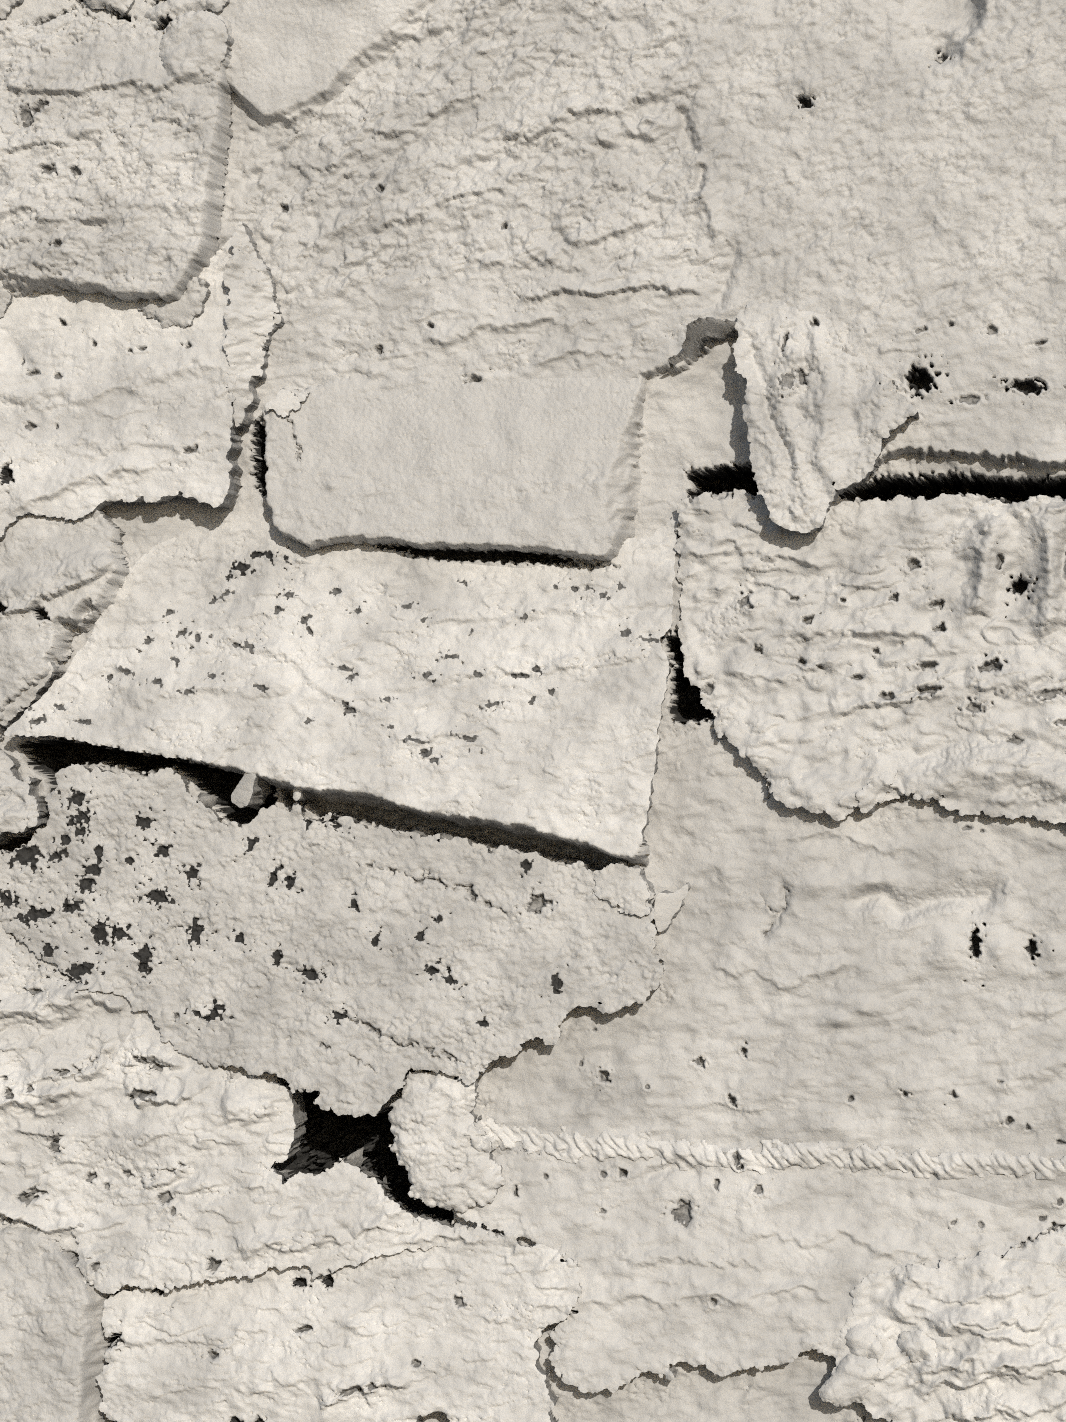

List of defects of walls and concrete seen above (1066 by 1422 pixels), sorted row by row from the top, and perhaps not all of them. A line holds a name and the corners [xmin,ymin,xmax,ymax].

crack [250,416,303,496]
crack [373,544,587,566]
crack [666,631,714,725]
crack [0,834,34,852]
crack [19,737,618,870]
crack [367,863,506,914]
flaking render [0,300,1066,1422]